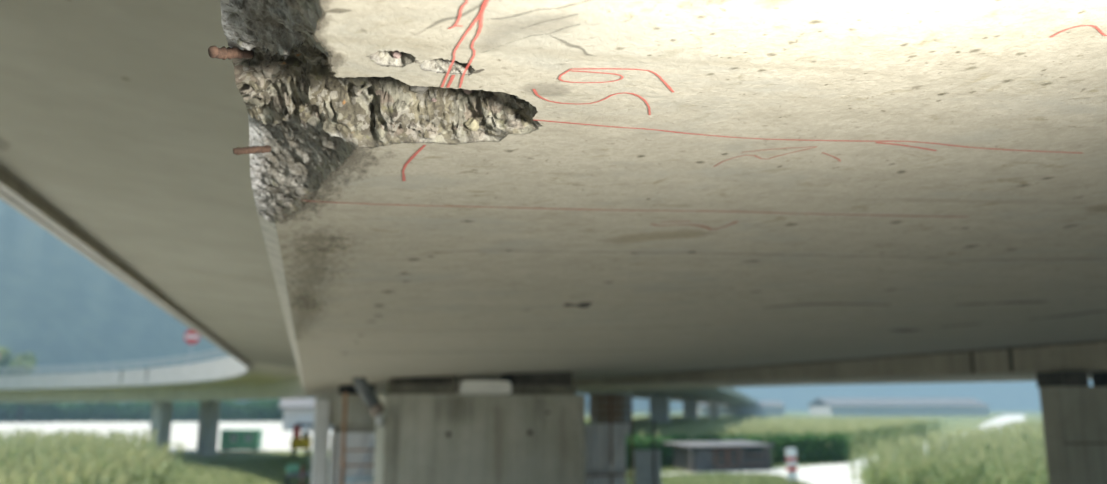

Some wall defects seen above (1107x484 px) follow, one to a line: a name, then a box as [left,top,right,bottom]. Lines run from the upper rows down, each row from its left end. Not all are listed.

spalling [208,0,542,224]